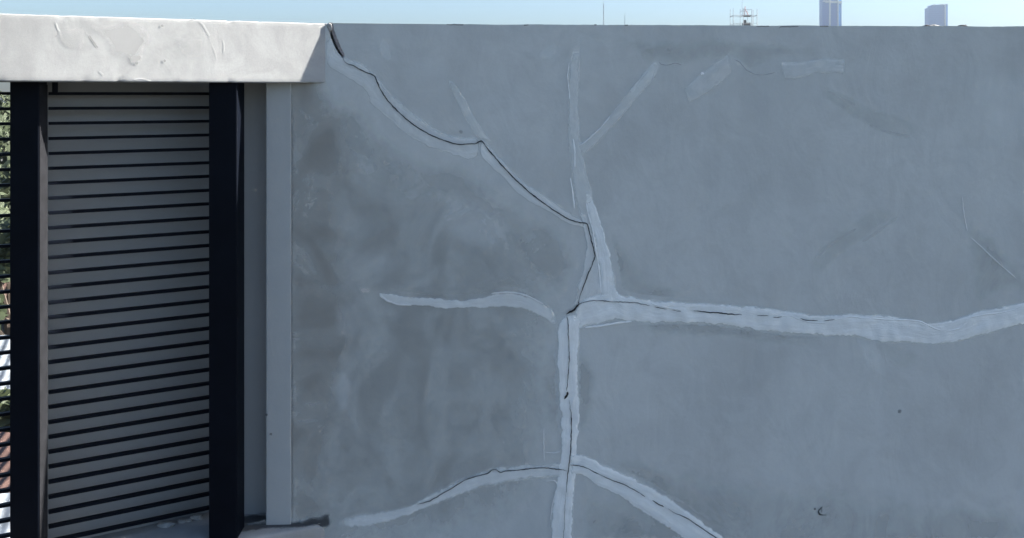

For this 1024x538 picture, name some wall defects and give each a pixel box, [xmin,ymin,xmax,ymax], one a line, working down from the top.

crack [327,23,835,538]